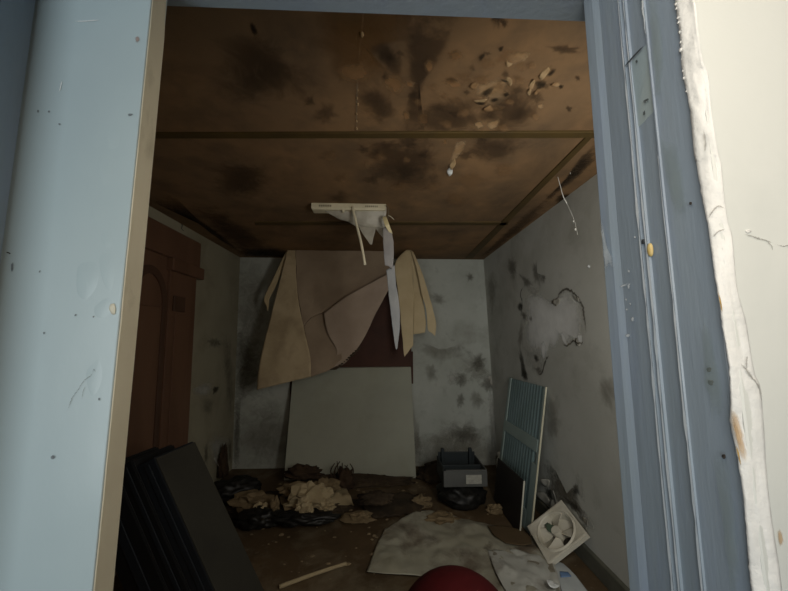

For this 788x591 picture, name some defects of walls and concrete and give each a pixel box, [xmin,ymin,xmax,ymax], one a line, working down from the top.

damp [335,19,394,81]
peeling [445,77,512,129]
peeling [527,67,563,96]
damp [555,154,588,202]
peeling [520,288,586,375]